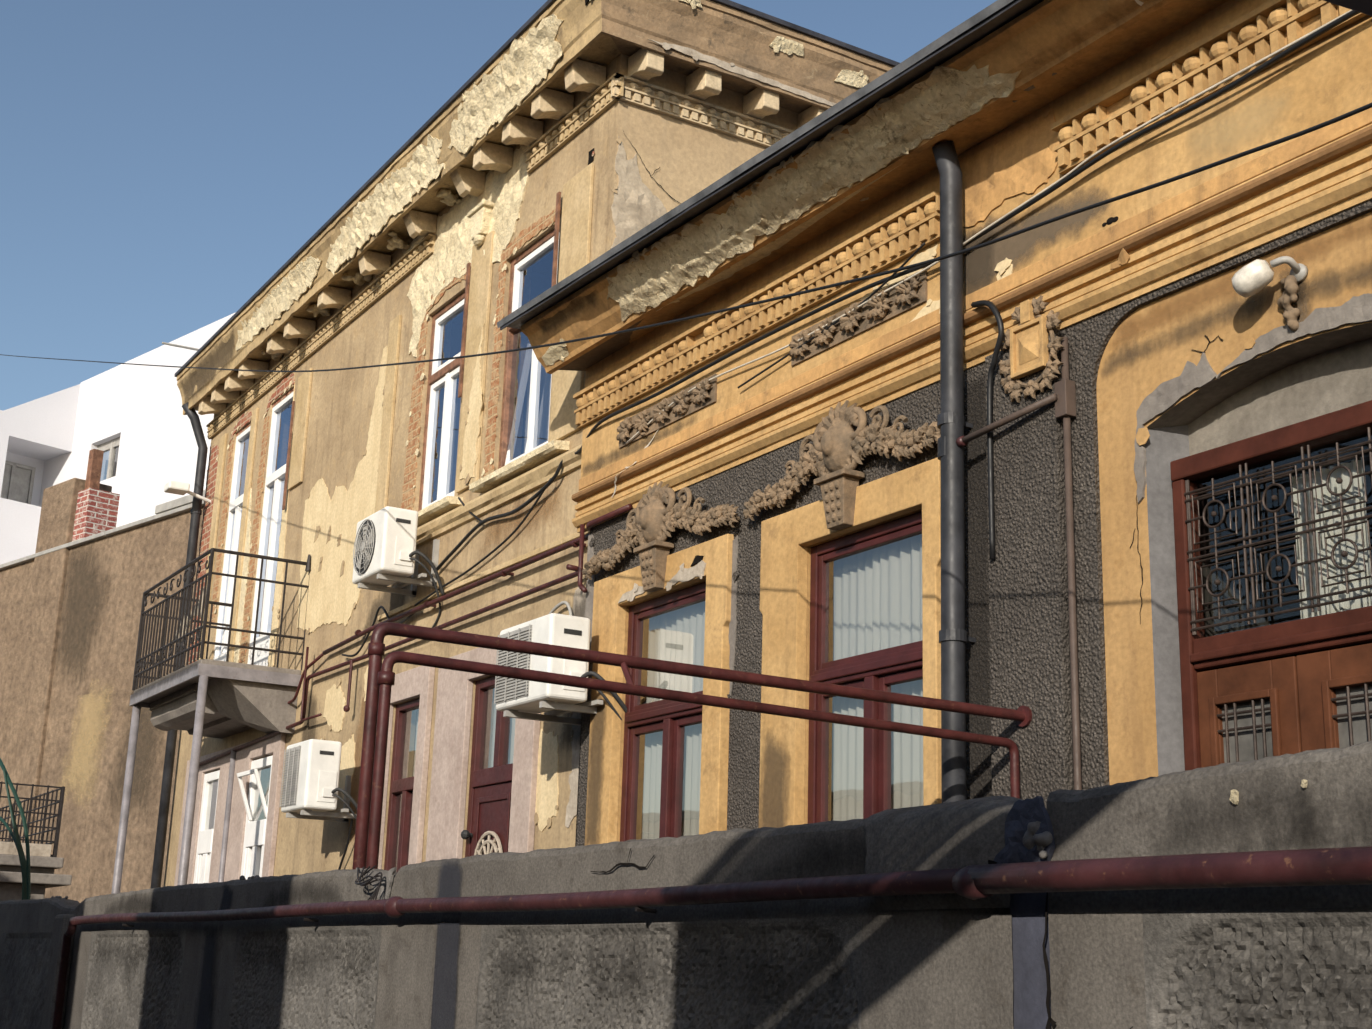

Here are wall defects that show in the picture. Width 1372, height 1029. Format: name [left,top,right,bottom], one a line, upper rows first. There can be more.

flaking render [647,36,836,107]
flaking render [236,14,564,351]
crack [623,131,681,204]
flaking render [606,64,1036,323]
flaking render [401,144,562,510]
flaking render [542,338,569,365]
peeling [1134,293,1372,503]
peeling [268,346,388,667]
crack [1130,495,1143,624]
flaking render [534,703,581,832]
crack [590,848,655,873]